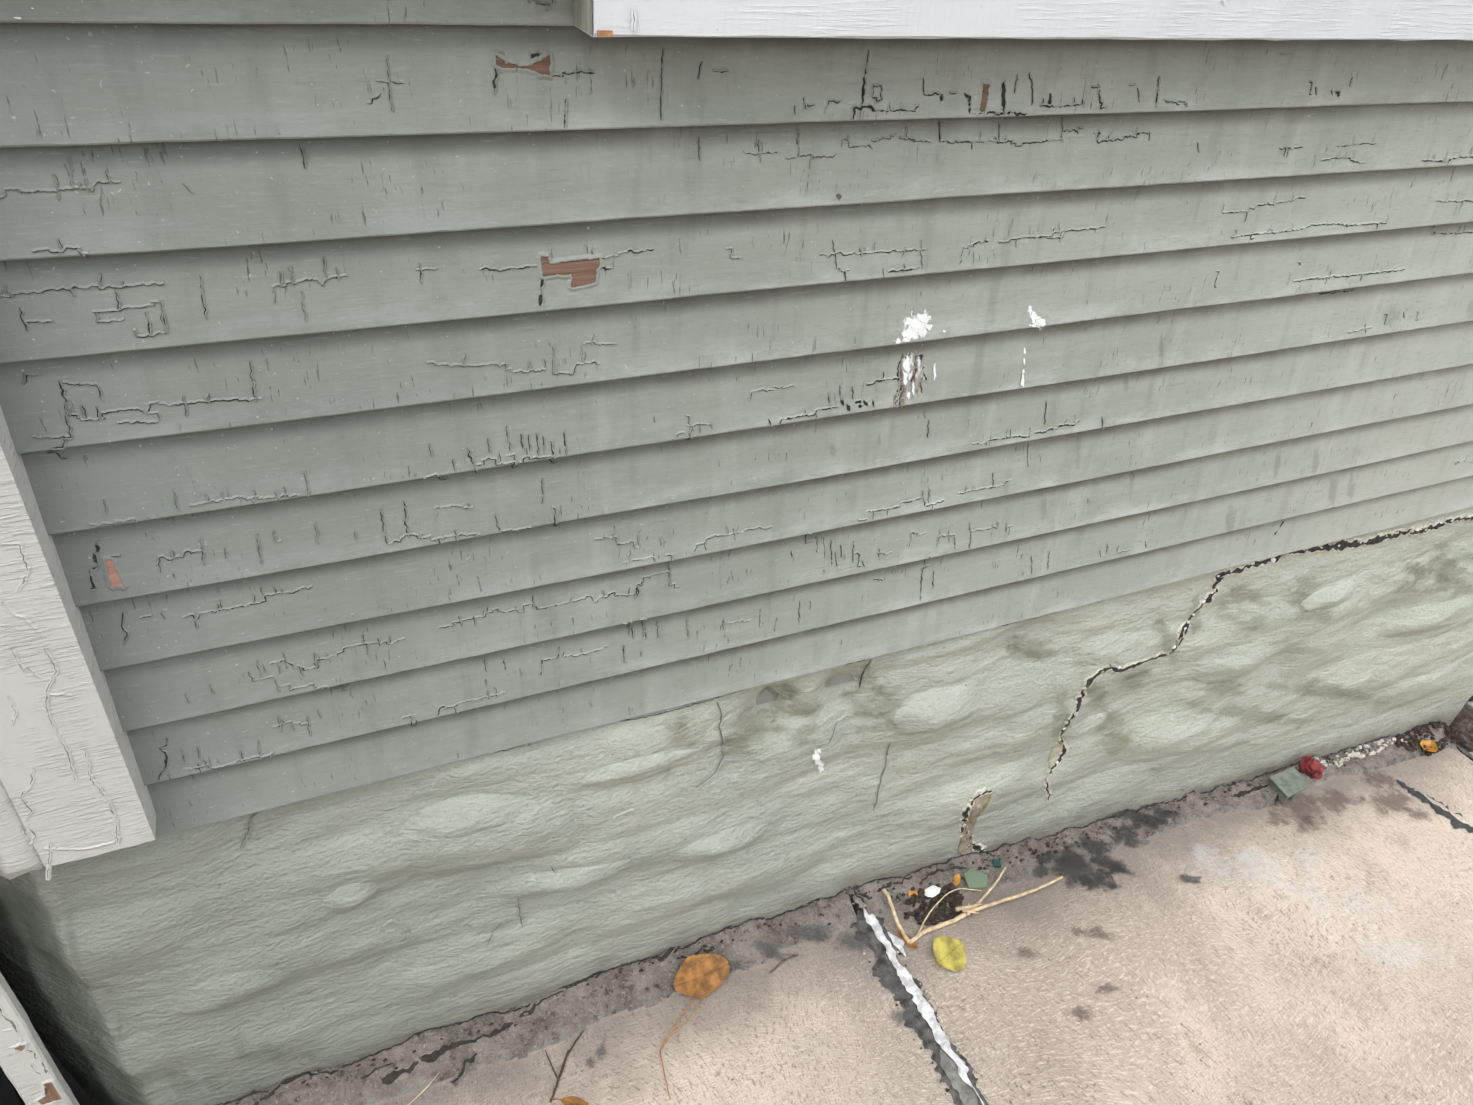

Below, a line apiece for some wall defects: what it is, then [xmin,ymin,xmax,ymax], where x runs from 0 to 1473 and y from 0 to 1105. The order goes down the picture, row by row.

peeling [490,49,595,95]
crack [0,158,121,200]
crack [726,246,742,259]
crack [0,238,169,338]
crack [199,274,209,320]
peeling [479,247,654,306]
peeling [893,352,928,407]
crack [21,362,262,459]
crack [803,514,1473,908]
peeling [8,1041,30,1053]
peeling [33,1079,66,1105]